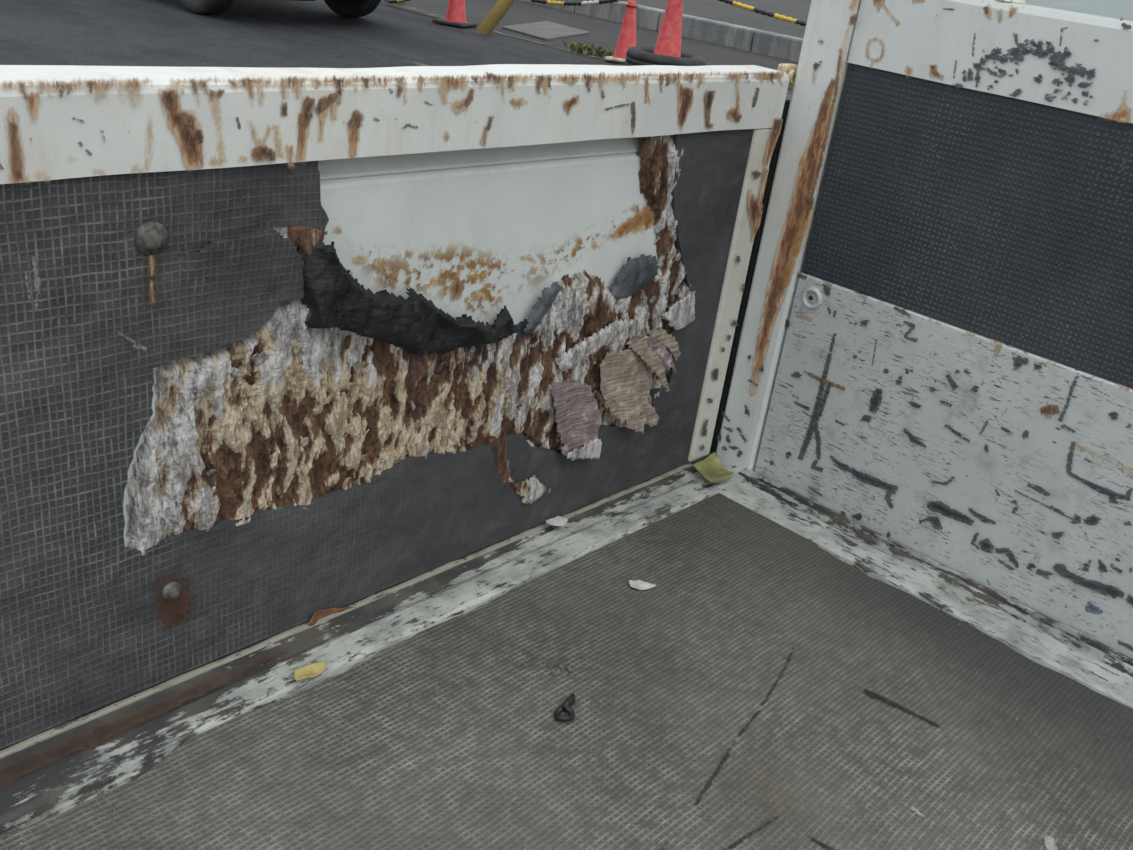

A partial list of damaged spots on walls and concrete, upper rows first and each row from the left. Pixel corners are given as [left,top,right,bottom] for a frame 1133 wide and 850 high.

rust [873,0,899,25]
peeling [952,33,1095,106]
rust [7,110,50,183]
rust [1,71,784,170]
rust [748,0,858,396]
rust [522,206,656,272]
rust [349,251,514,311]
peeling [126,135,695,556]
peeling [995,346,1042,371]
peeling [861,389,882,423]
peeling [830,456,898,508]
peeling [919,501,1133,614]